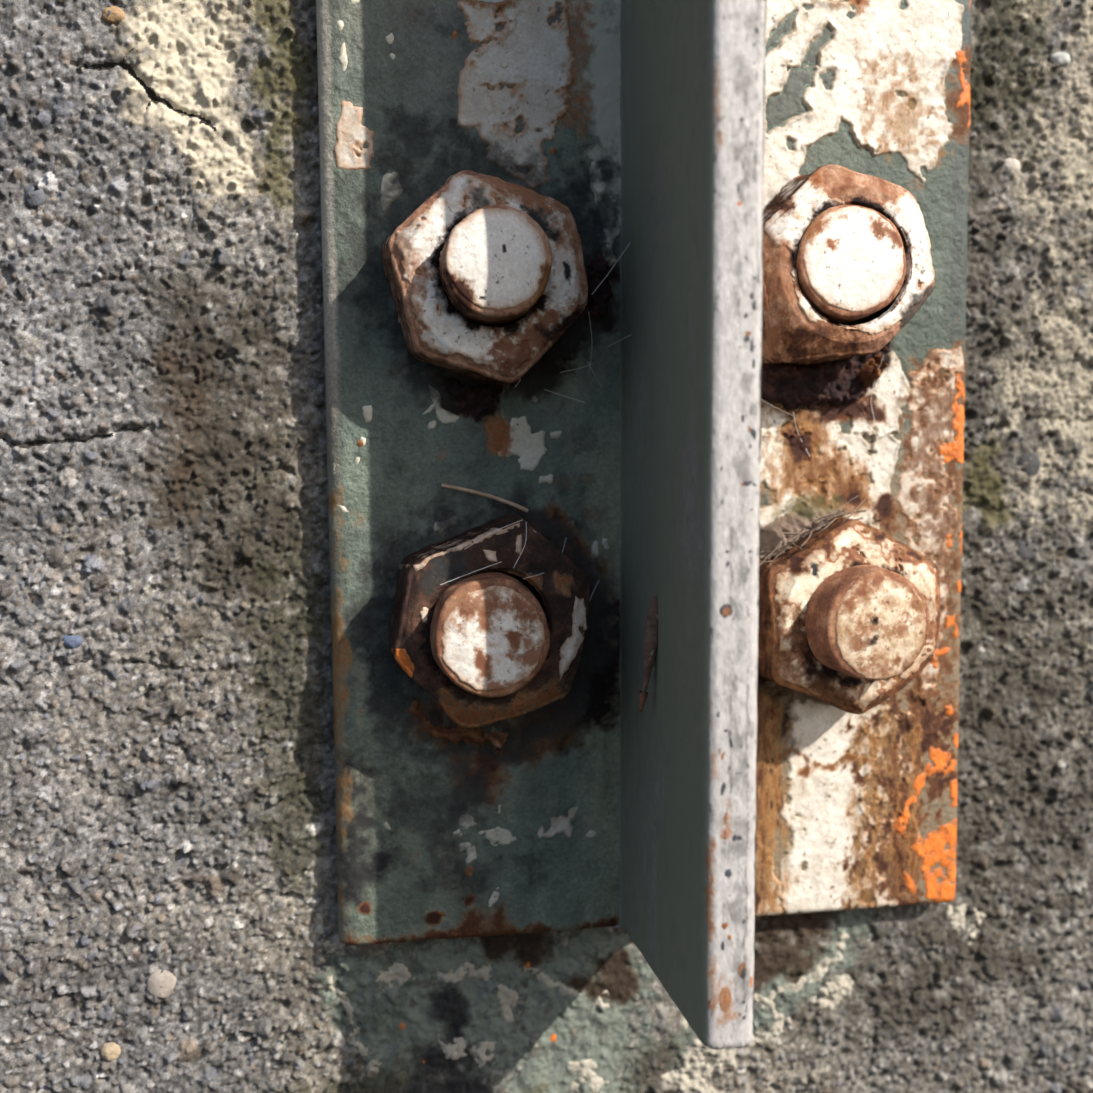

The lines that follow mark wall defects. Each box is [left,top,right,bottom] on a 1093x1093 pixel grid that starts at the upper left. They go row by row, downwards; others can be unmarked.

crack [70,48,227,138]
peeling [337,20,348,71]
peeling [334,100,374,170]
peeling [750,0,964,211]
rust [381,175,620,456]
rust [400,505,621,752]
peeling [452,0,746,1046]
peeling [741,347,965,698]
rust [755,164,965,915]
peeling [742,698,923,924]
rust [345,895,552,971]
rust [566,948,638,1005]